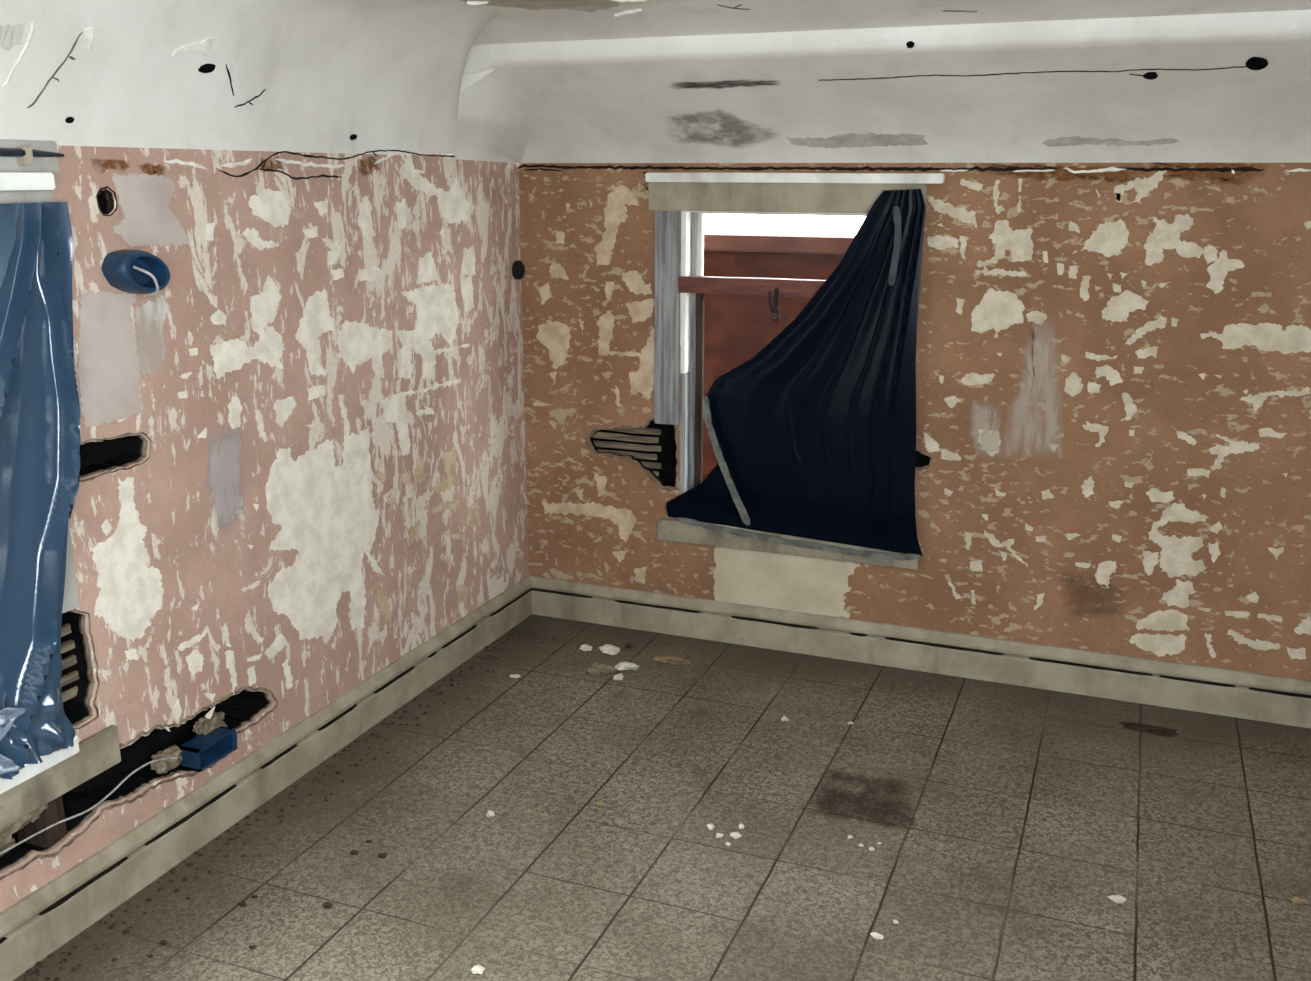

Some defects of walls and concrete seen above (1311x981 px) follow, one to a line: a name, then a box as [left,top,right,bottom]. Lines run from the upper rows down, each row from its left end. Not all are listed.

damp [684,116,768,145]
flaking render [96,158,252,248]
peeling [241,188,291,251]
peeling [374,151,474,237]
peeling [536,184,655,406]
peeling [927,167,1245,447]
peeling [1200,323,1311,354]
spalling [586,418,679,491]
peeling [0,195,476,881]
peeling [542,473,648,584]
peeling [1109,427,1311,660]
damp [818,774,911,826]